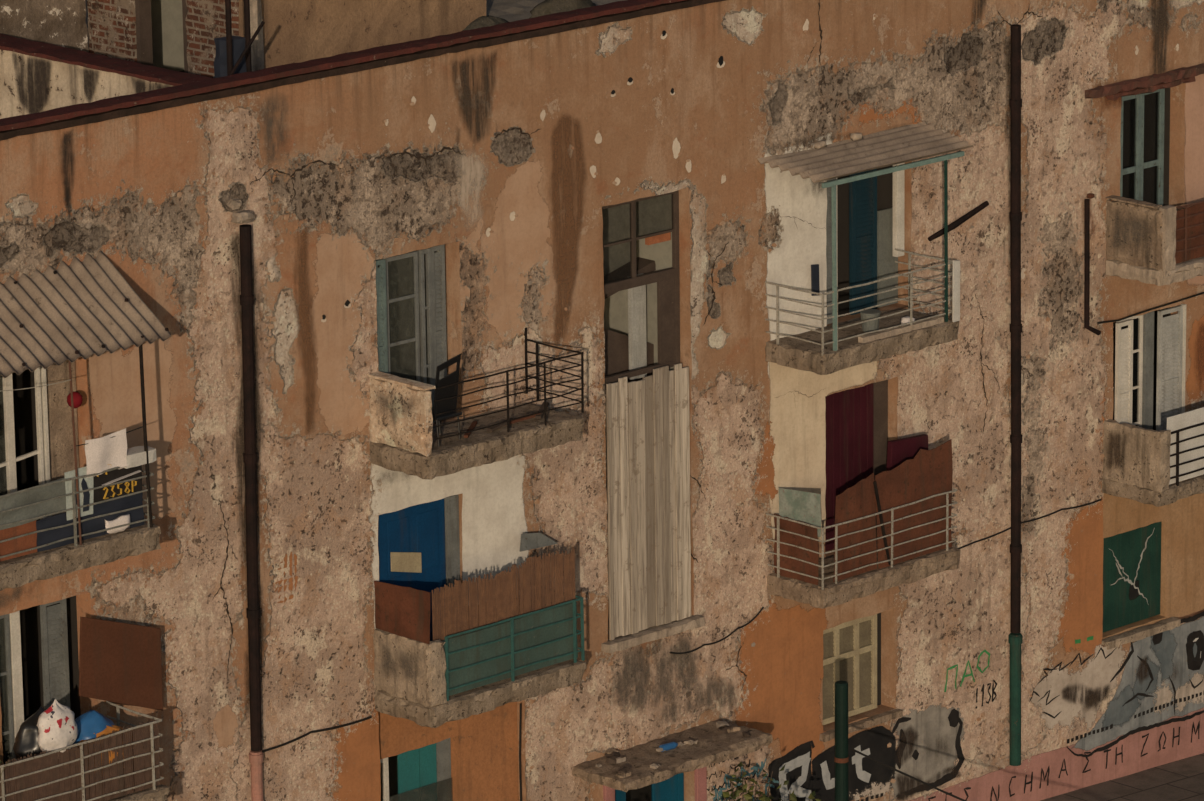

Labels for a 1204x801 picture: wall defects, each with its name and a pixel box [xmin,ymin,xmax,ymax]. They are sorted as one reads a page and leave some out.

leakage [62,133,73,206]
leakage [459,156,482,221]
leakage [453,55,495,140]
leakage [552,116,585,341]
crack [807,0,822,71]
leakage [1152,0,1168,73]
flaking render [0,93,609,801]
flaking render [525,137,780,801]
flaking render [750,0,1204,801]
crack [213,498,236,677]